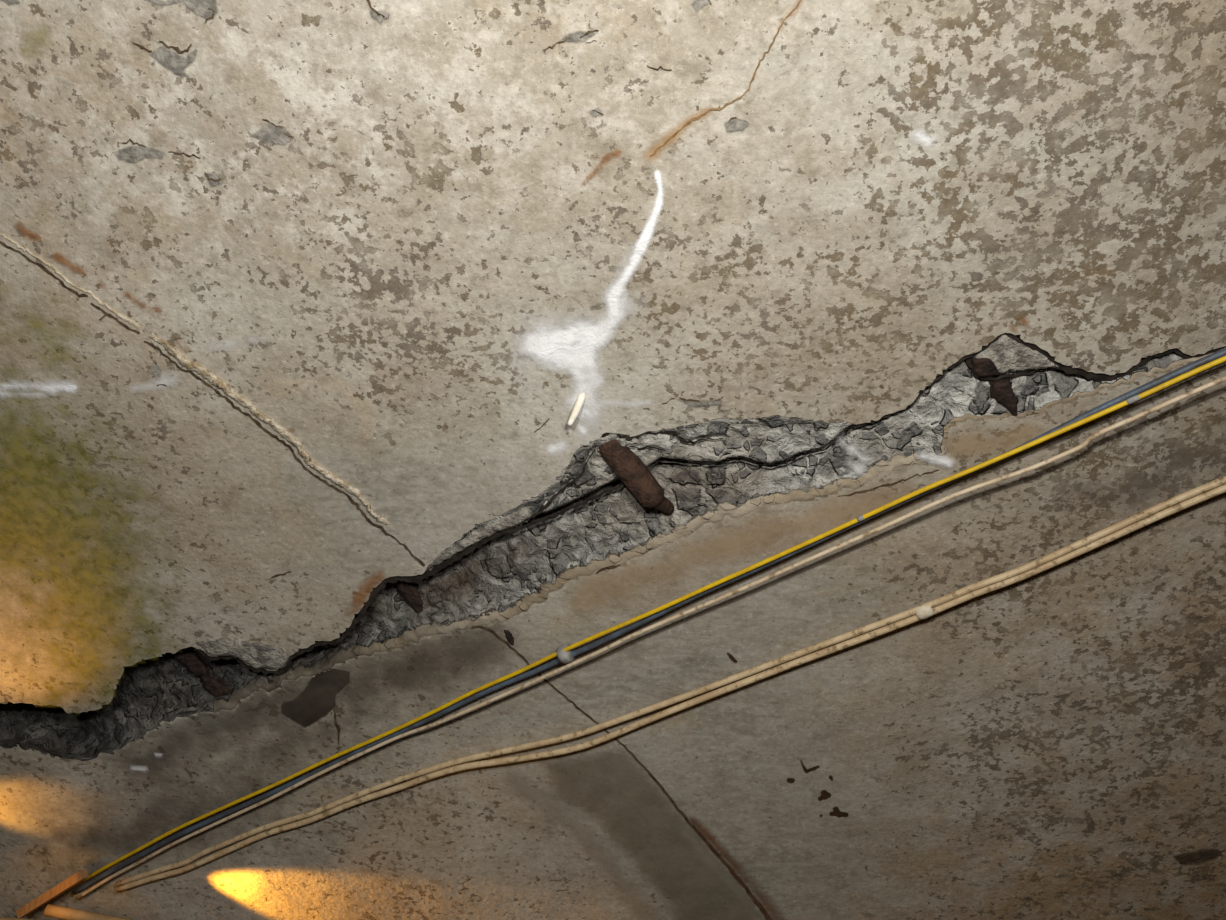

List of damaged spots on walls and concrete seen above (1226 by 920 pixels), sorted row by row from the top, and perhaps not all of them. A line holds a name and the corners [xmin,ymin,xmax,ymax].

crack [649,0,801,157]
damp [520,170,663,434]
spalling [662,397,723,407]
rust [968,357,1018,415]
damp [548,442,565,453]
crack [0,233,1226,920]
rust [172,650,231,697]